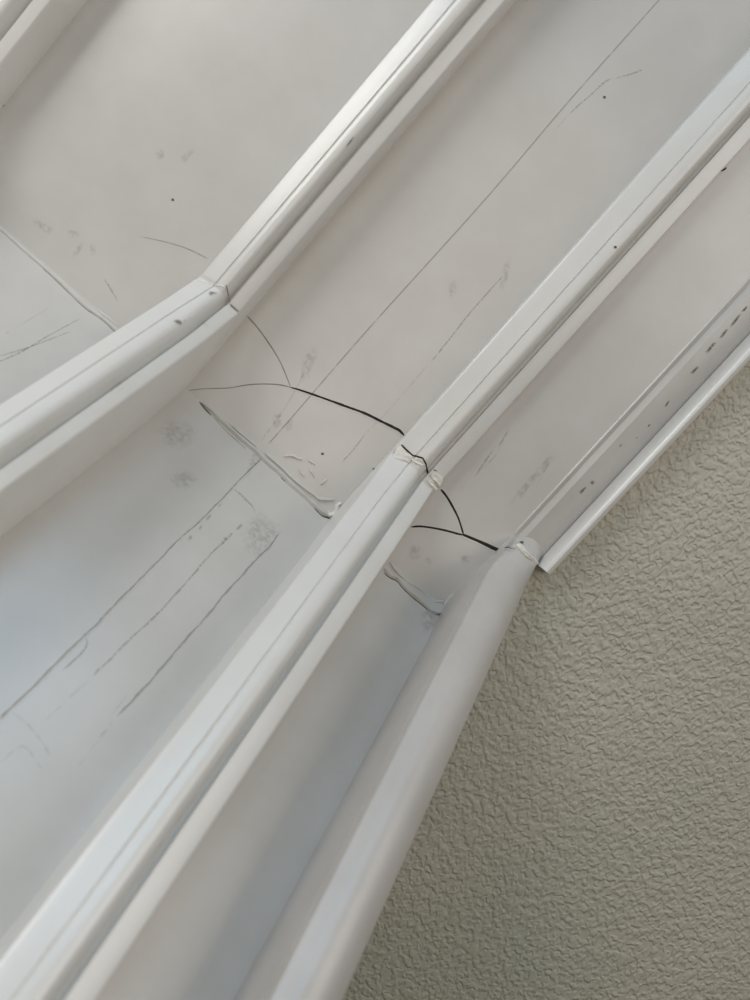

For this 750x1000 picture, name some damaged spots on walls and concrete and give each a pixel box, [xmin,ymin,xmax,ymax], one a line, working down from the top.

crack [189,280,512,552]